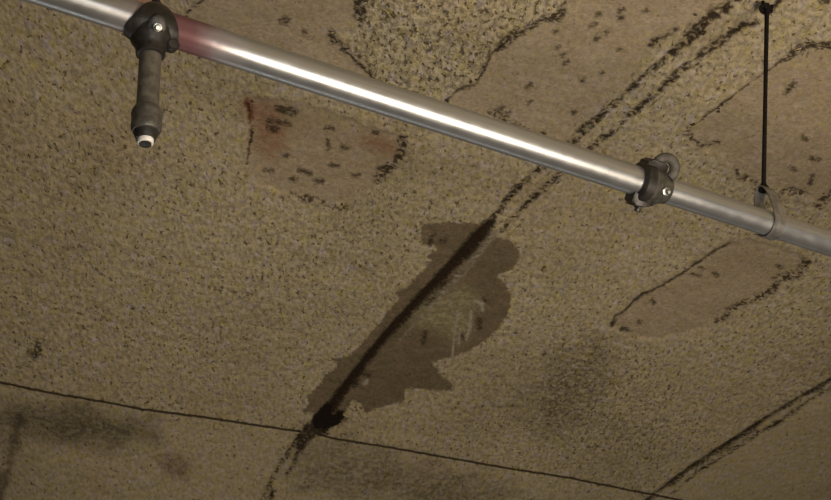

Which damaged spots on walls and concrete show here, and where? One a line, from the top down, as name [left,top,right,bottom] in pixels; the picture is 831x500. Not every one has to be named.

crack [567,0,782,150]
water stain [303,223,519,423]
crack [0,166,831,500]